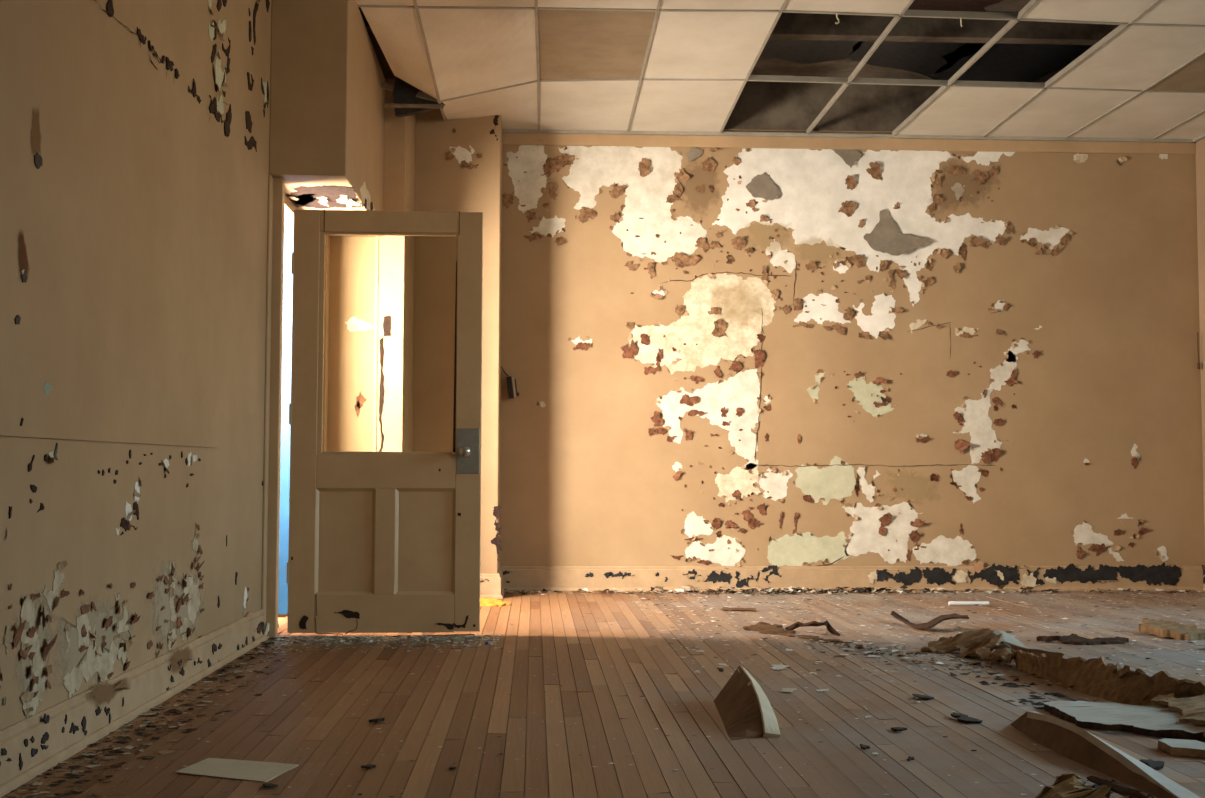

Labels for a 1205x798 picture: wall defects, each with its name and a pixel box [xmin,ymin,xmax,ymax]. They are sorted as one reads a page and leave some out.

peeling [137,0,270,152]
peeling [445,128,482,170]
peeling [502,137,1182,588]
peeling [491,505,512,583]
peeling [0,523,222,770]